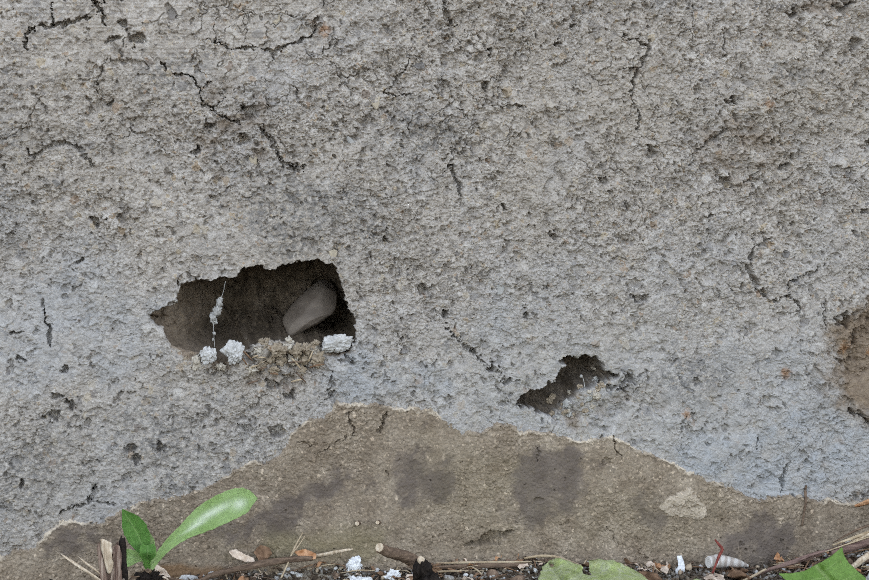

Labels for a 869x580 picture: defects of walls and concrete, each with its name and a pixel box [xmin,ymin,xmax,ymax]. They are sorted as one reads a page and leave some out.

crack [23,0,124,51]
spalling [784,0,857,20]
crack [171,71,307,172]
spalling [148,249,357,390]
spalling [833,300,869,424]
spalling [0,354,869,561]